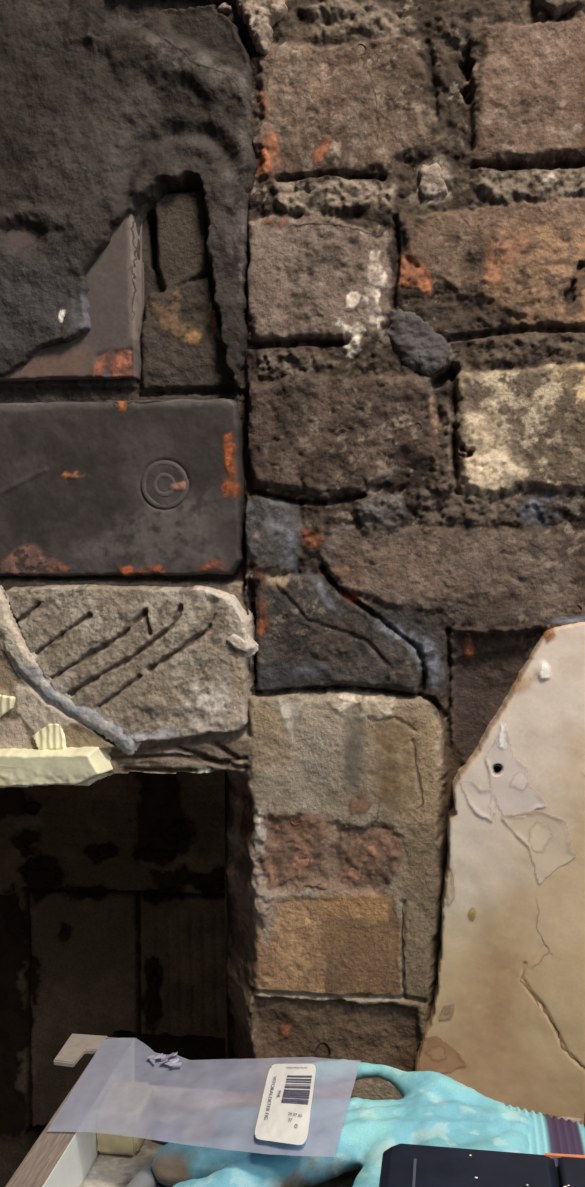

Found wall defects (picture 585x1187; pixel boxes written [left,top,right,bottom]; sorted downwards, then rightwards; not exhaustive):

spalling [151,290,221,344]
spalling [92,349,133,379]
crack [520,898,585,1068]